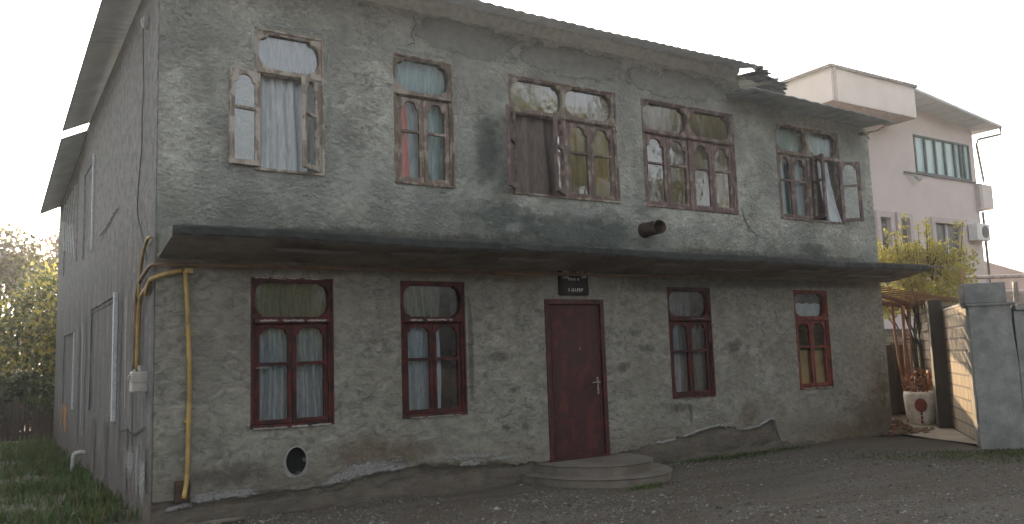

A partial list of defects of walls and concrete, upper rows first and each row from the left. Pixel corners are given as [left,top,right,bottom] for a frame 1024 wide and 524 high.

spalling [639,418,778,463]
peeling [321,457,409,486]
peeling [164,488,259,512]